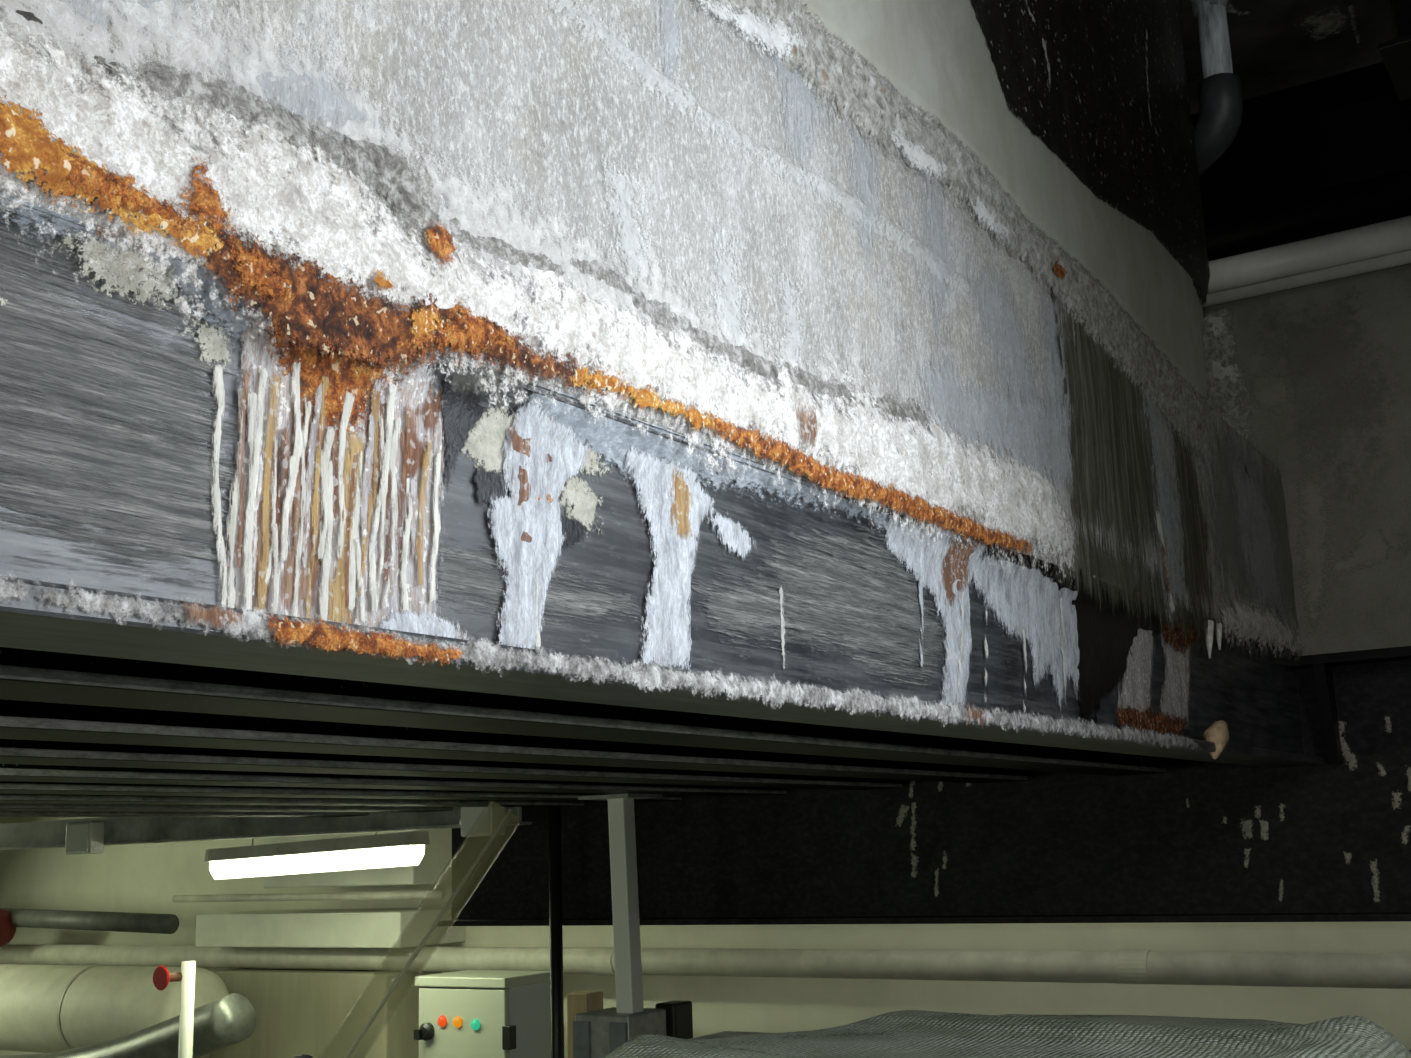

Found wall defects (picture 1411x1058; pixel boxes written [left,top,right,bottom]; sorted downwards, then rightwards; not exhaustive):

spalling [0,5,43,24]
peeling [0,216,241,600]
peeling [435,538,514,616]
peeling [440,371,516,505]
spalling [84,55,931,433]
corrosion [0,95,1033,640]
peeling [541,444,638,632]
water stain [0,0,1304,760]